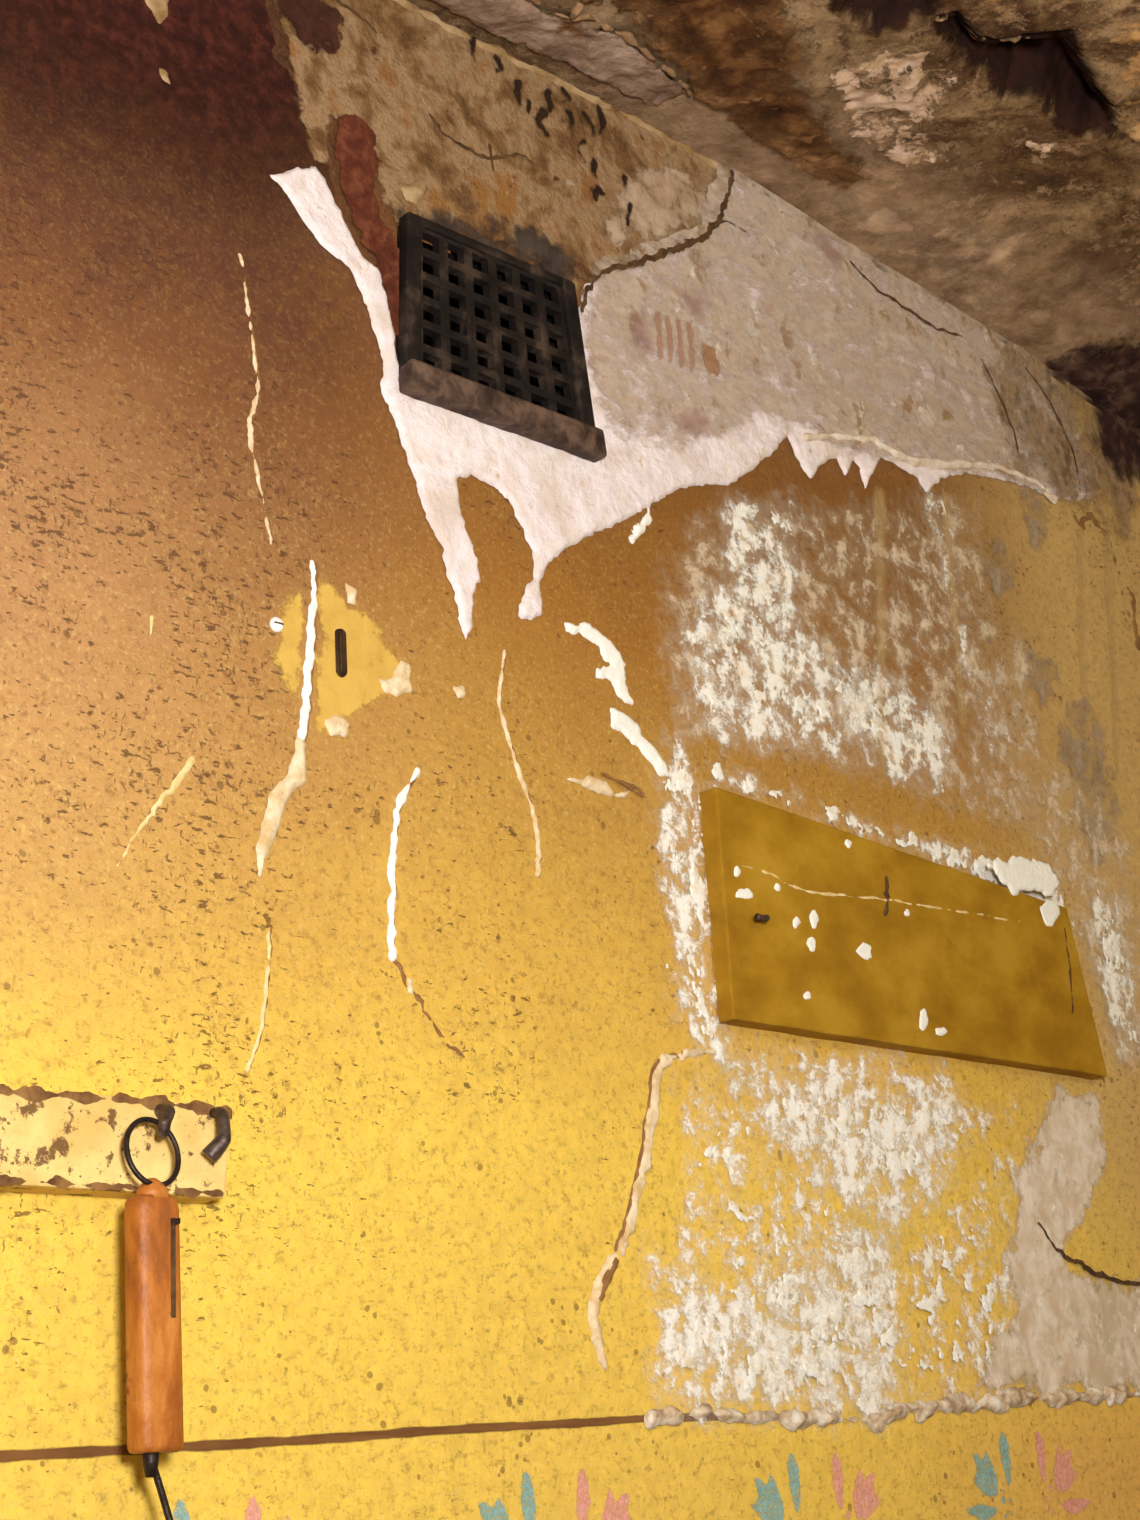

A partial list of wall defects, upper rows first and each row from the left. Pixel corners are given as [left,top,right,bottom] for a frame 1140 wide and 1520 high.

peeling [145,0,169,24]
leakage [0,0,345,149]
leakage [828,0,1126,138]
crack [238,253,273,544]
crack [581,170,746,312]
spalling [270,0,1092,639]
leakage [586,164,1140,546]
crack [297,560,319,741]
peeling [564,622,669,777]
crack [387,767,471,1062]
leakage [646,493,1140,1432]
spalling [978,1083,1140,1401]